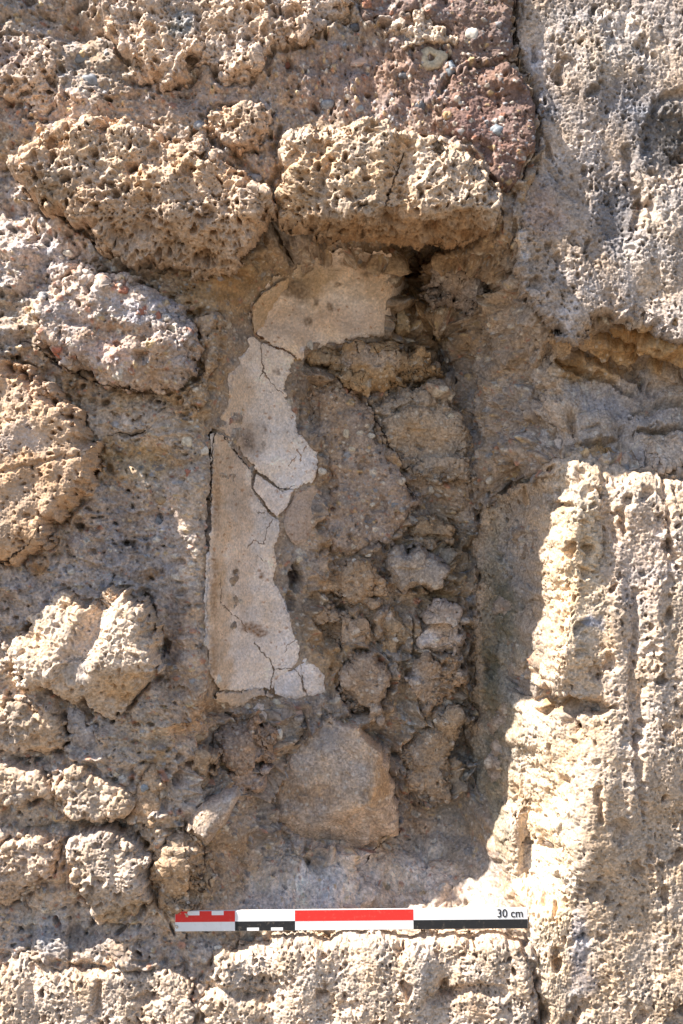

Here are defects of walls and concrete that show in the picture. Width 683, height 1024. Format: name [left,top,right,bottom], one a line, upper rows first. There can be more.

crack [256,334,297,393]
crack [204,431,307,561]
peeling [203,247,415,720]
crack [220,579,304,691]